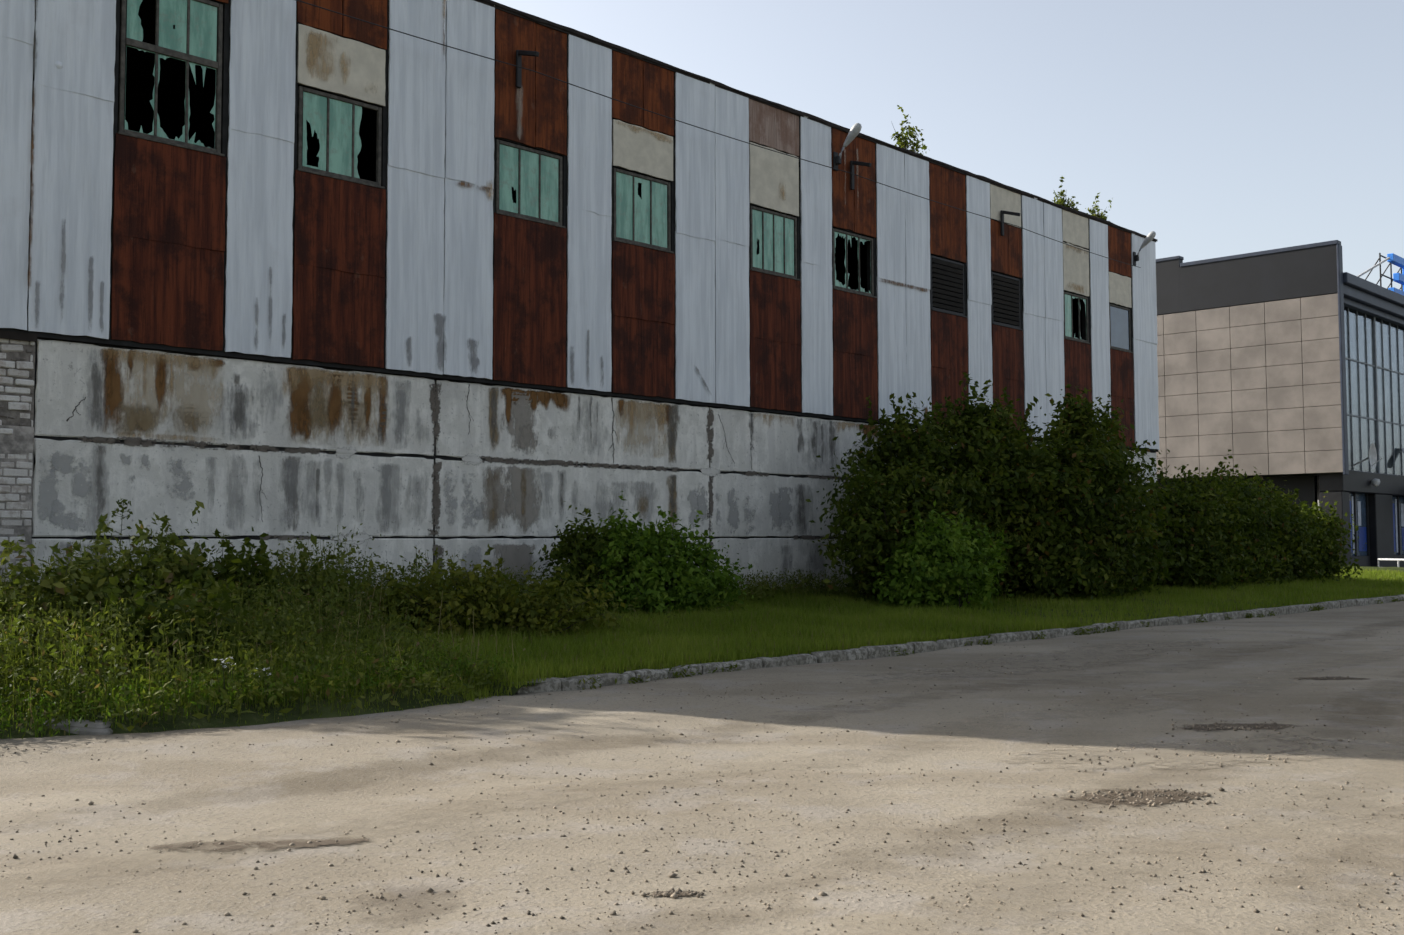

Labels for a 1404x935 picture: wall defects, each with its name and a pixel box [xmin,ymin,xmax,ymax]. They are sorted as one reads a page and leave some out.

rust [102,349,225,440]
rust [285,368,387,442]
rust [501,388,569,422]
leakage [284,456,297,527]